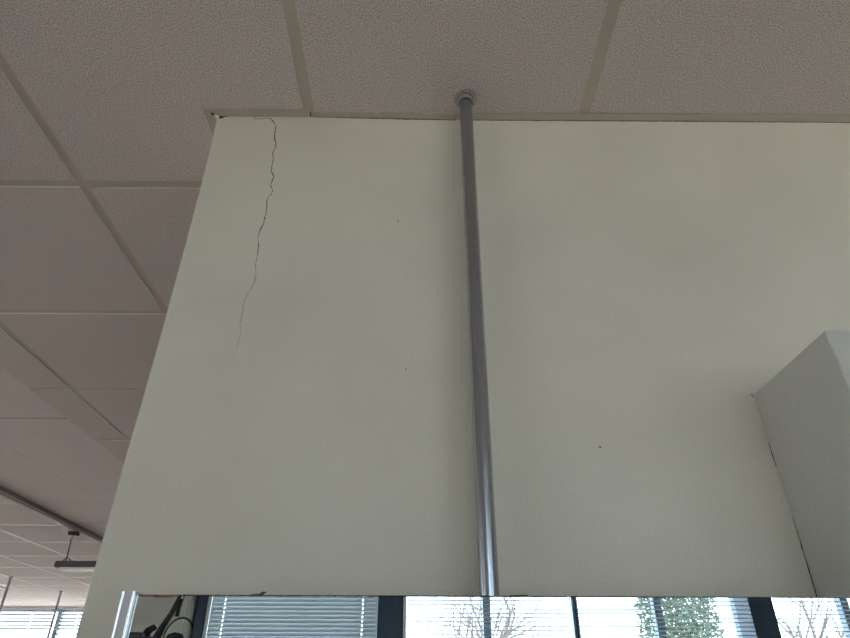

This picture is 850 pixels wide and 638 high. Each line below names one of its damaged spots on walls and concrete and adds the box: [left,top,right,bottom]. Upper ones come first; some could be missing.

crack [237,118,276,346]